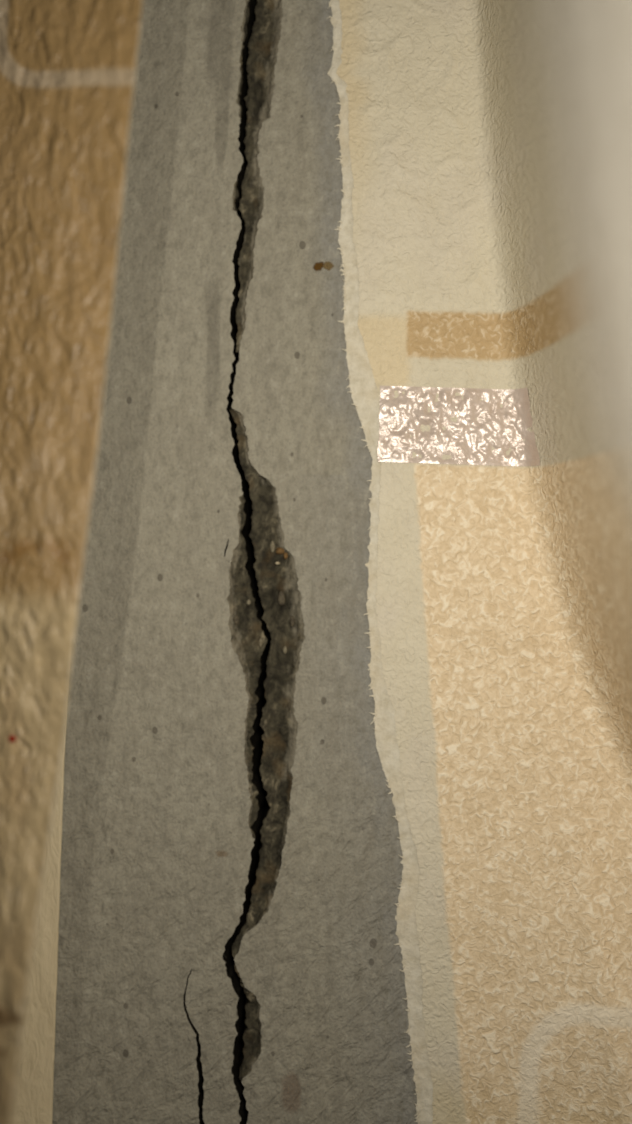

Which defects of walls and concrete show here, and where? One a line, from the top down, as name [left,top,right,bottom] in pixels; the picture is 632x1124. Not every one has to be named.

flaking render [232,0,283,352]
crack [183,969,205,1124]
crack [223,0,272,1124]
flaking render [227,410,305,1081]